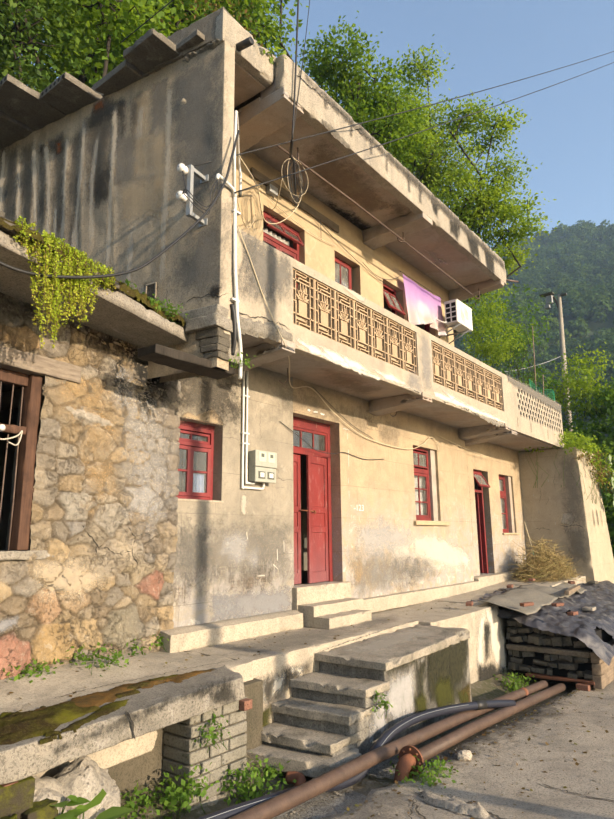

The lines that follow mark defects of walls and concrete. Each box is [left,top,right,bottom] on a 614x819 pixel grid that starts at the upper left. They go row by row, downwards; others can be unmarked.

water stain [33,136,69,241]
water stain [74,94,143,266]
water stain [160,53,225,278]
water stain [175,227,228,297]
water stain [243,234,291,300]
spalling [66,406,113,427]
water stain [116,681,235,725]
crack [408,792,426,819]
crack [543,784,614,801]